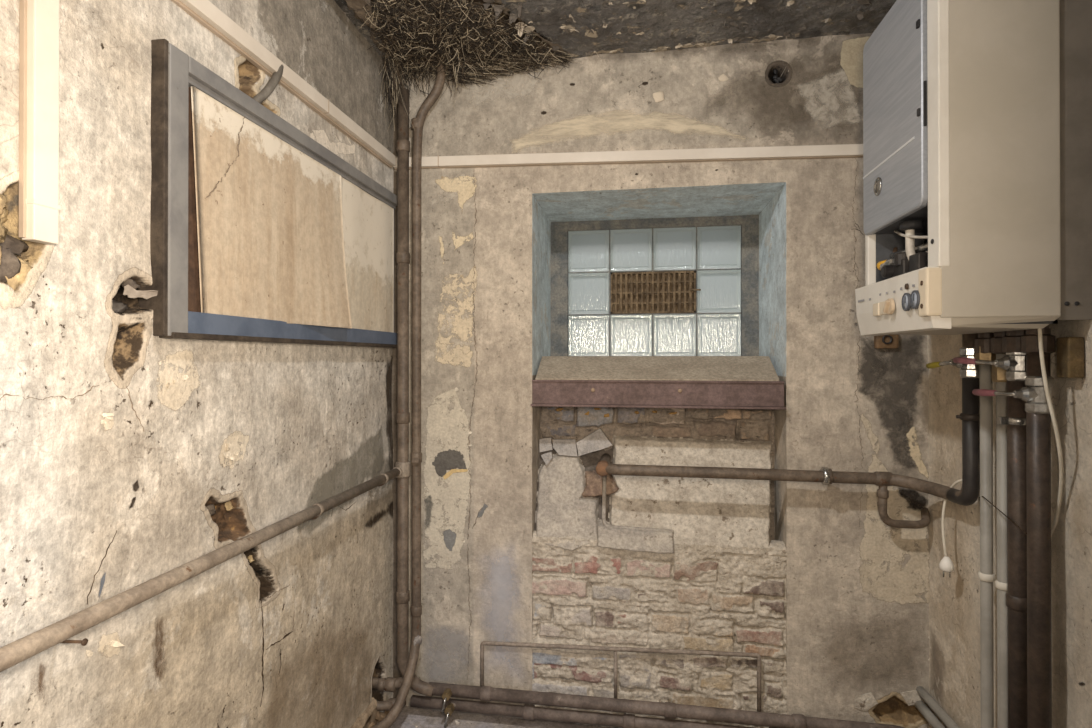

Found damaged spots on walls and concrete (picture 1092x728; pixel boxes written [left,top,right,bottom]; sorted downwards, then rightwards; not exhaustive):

spalling [344,0,800,131]
spalling [0,171,55,310]
spalling [104,267,158,389]
peeling [435,232,477,368]
crack [0,378,144,432]
spalling [200,488,256,549]
spalling [241,544,282,608]
peeling [423,387,472,570]
spalling [539,437,578,466]
leakage [859,337,925,468]
crack [260,586,294,707]
spalling [853,690,929,728]